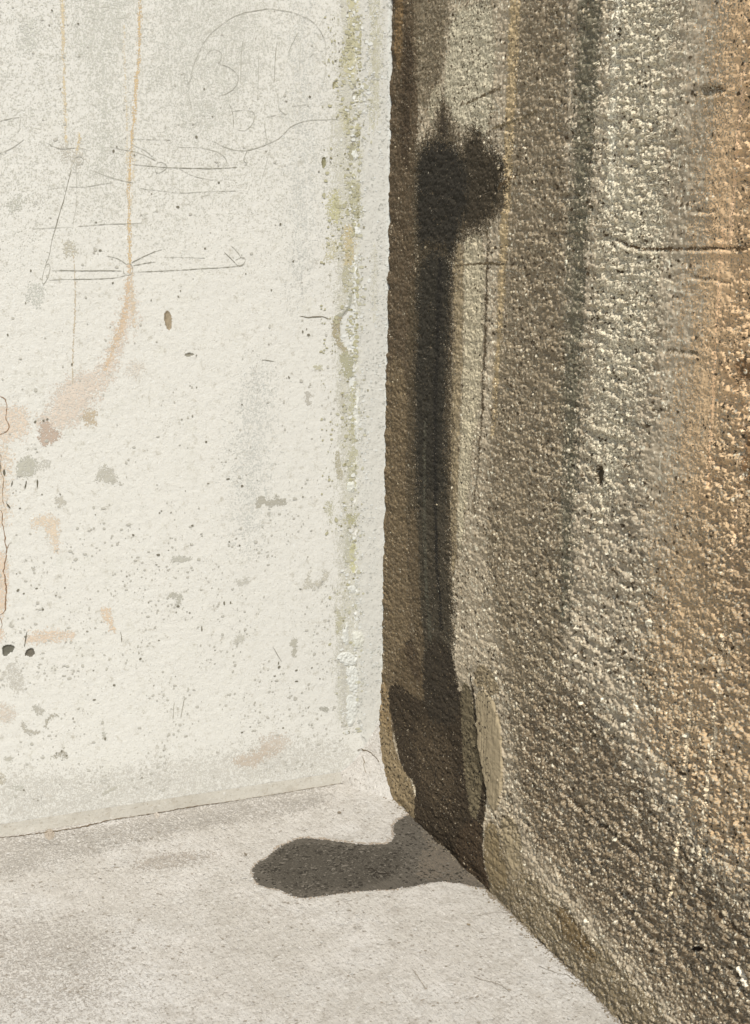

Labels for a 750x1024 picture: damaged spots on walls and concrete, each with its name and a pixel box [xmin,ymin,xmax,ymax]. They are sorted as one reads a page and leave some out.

rust [0,0,147,529]
crack [455,260,504,268]
crack [617,238,750,284]